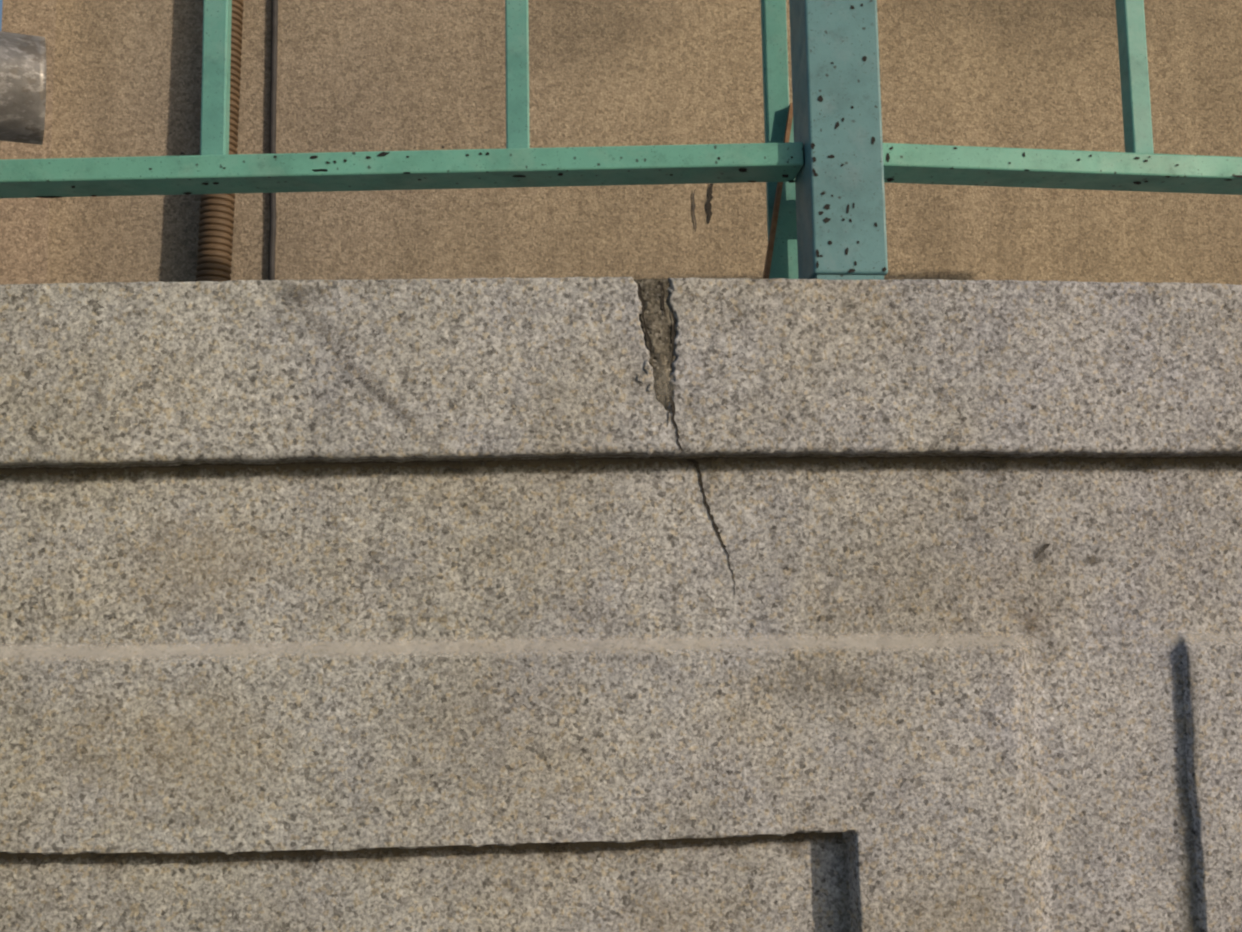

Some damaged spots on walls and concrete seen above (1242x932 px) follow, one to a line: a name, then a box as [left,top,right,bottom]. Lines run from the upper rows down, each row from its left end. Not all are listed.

crack [666,381,735,595]